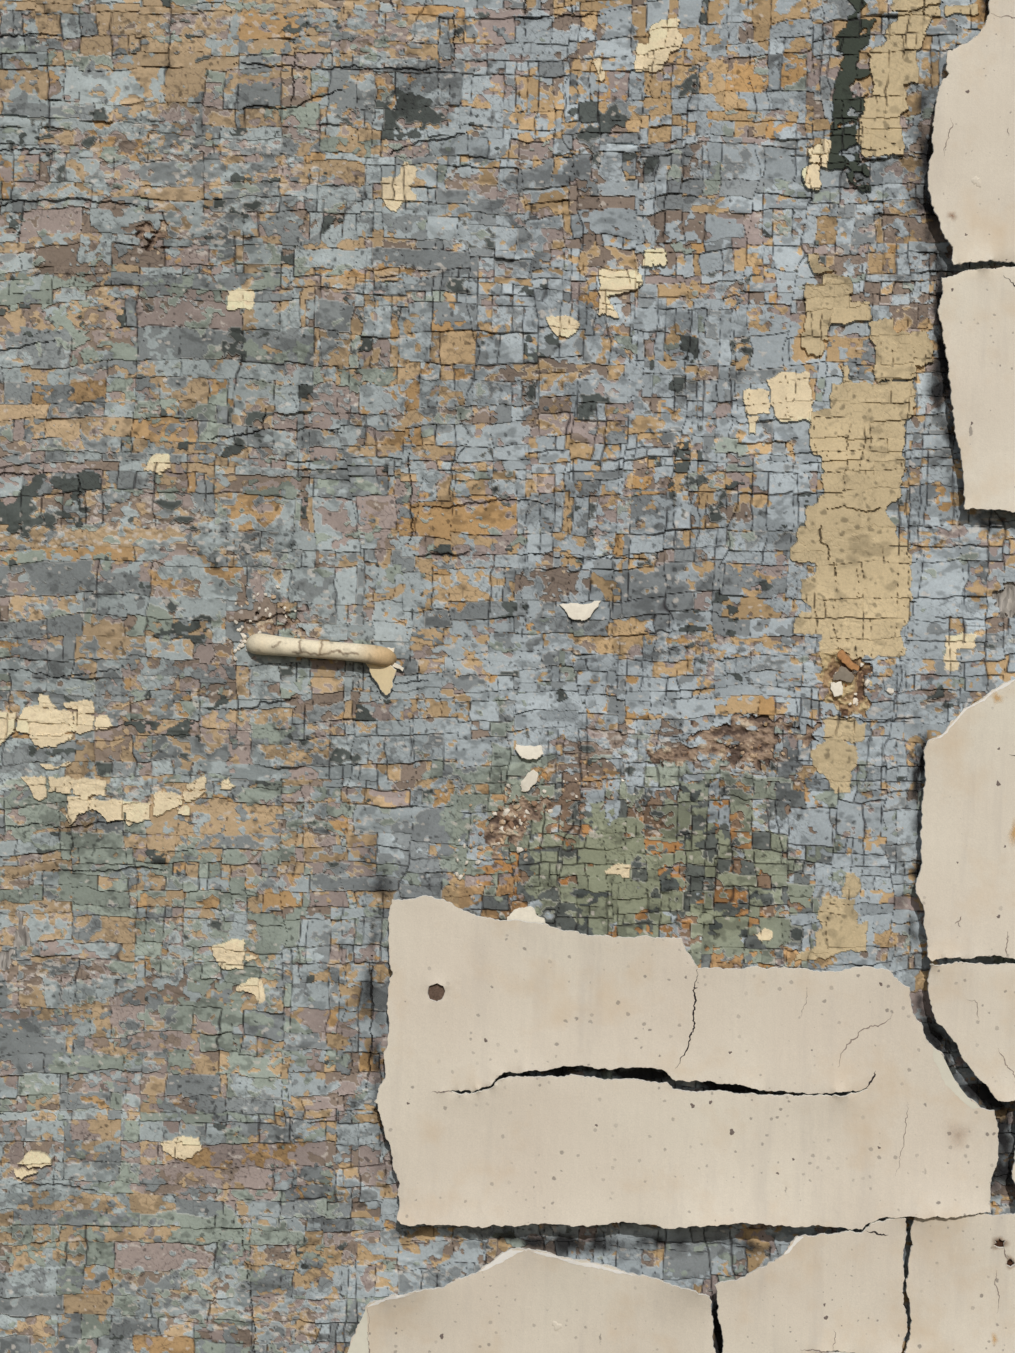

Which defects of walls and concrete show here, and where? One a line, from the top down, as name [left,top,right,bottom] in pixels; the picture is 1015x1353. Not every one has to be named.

peeling [634,18,684,74]
peeling [598,248,668,319]
crack [208,408,334,442]
peeling [646,0,1015,794]
crack [533,554,659,562]
peeling [559,601,601,621]
peeling [0,694,236,827]
peeling [347,680,1015,1353]
crack [650,1068,709,1092]
crack [739,1072,876,1096]
crack [984,1177,1015,1215]
crack [902,1216,914,1353]